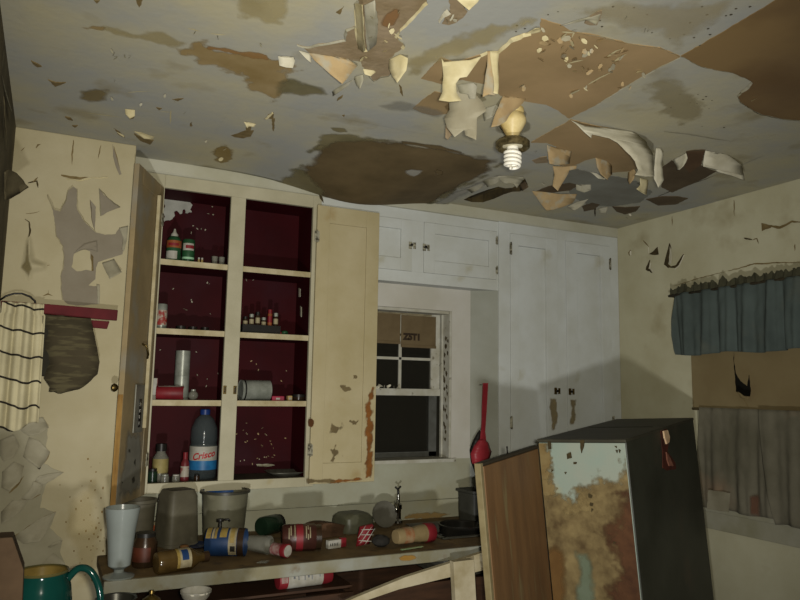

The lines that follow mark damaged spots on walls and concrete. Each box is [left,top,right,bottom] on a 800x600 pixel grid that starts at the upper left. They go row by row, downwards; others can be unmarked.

water stain [82,90,106,101]
peeling [114,128,154,145]
water stain [86,26,325,98]
peeling [231,122,256,138]
peeling [278,0,428,101]
water stain [280,128,502,205]
peeling [413,0,800,218]
peeling [47,185,128,306]
crack [628,240,800,286]
crack [744,220,800,244]
peeling [0,417,65,567]